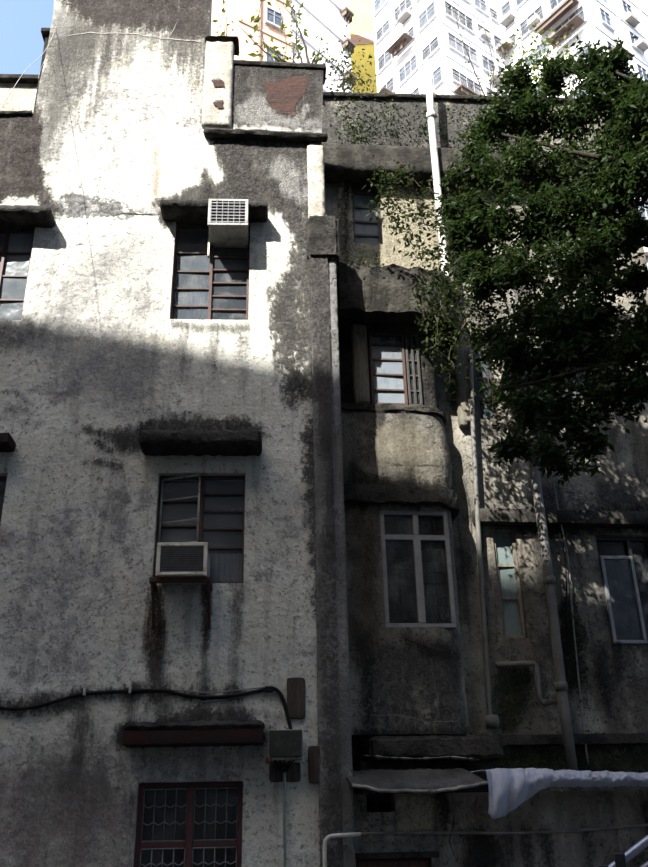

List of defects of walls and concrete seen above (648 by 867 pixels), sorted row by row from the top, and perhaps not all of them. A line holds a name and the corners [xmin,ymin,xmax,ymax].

water stain [0,0,211,219]
spalling [263,76,309,123]
water stain [136,138,469,867]
corrosion [143,585,166,681]
water stain [460,824,556,867]